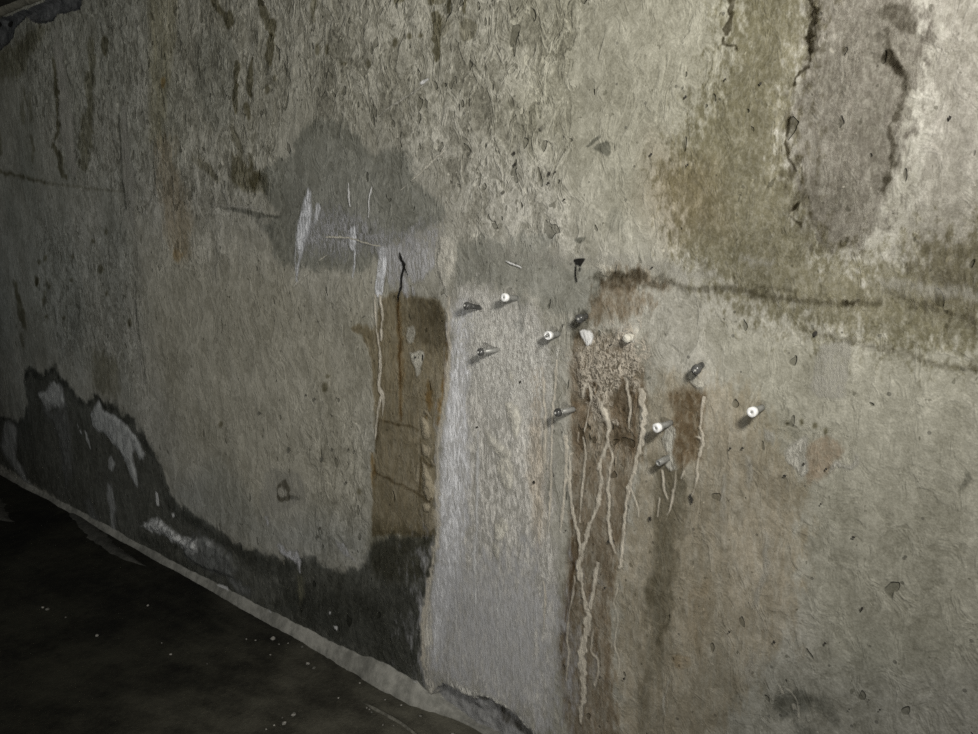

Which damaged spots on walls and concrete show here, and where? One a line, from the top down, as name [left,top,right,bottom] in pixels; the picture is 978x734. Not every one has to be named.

spalling [0,0,82,50]
crack [723,0,738,50]
crack [793,2,819,85]
crack [785,117,796,169]
crack [397,253,408,302]
leakage [696,397,705,482]
leakage [144,514,210,552]
leakage [277,544,300,571]
leakage [414,285,648,734]